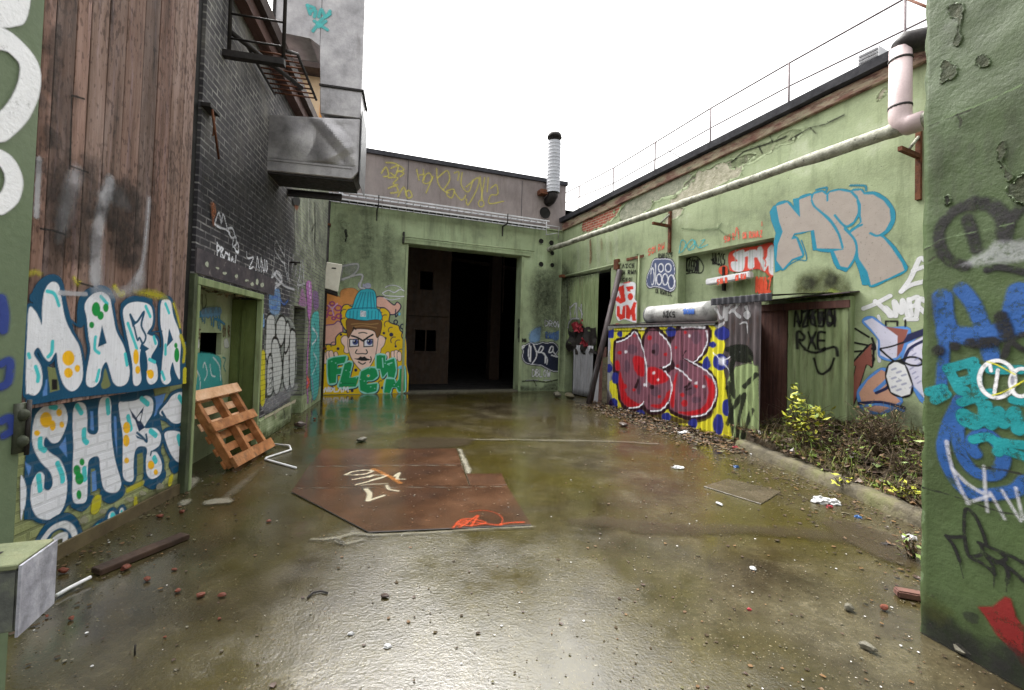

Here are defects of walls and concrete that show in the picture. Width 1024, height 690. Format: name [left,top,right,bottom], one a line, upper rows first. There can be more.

peeling [946,2,966,47]
flaking render [939,59,959,85]
flaking render [974,53,992,69]
peeling [580,126,807,234]
peeling [996,140,1024,207]